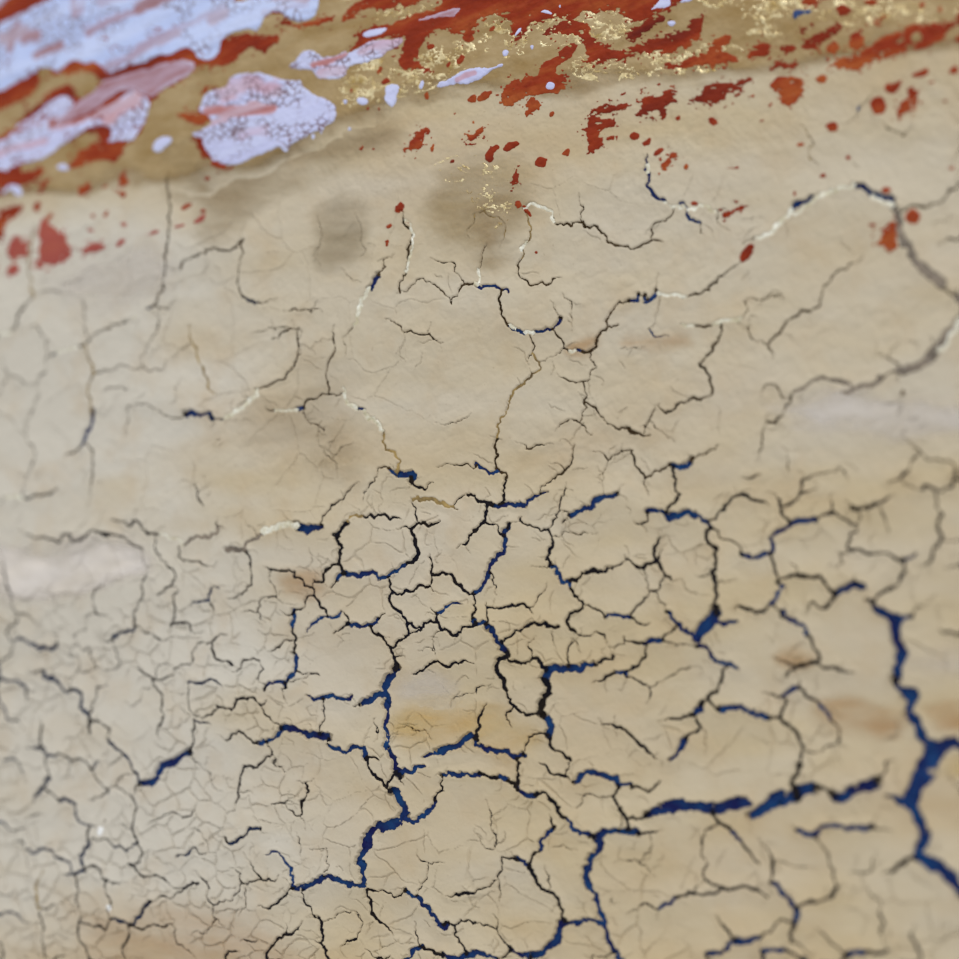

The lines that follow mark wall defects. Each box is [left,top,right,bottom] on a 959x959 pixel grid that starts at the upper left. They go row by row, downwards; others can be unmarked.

peeling [192,72,336,165]
peeling [363,28,387,37]
peeling [437,64,503,87]
crack [517,155,729,287]
crack [743,163,959,452]
crack [0,213,959,959]